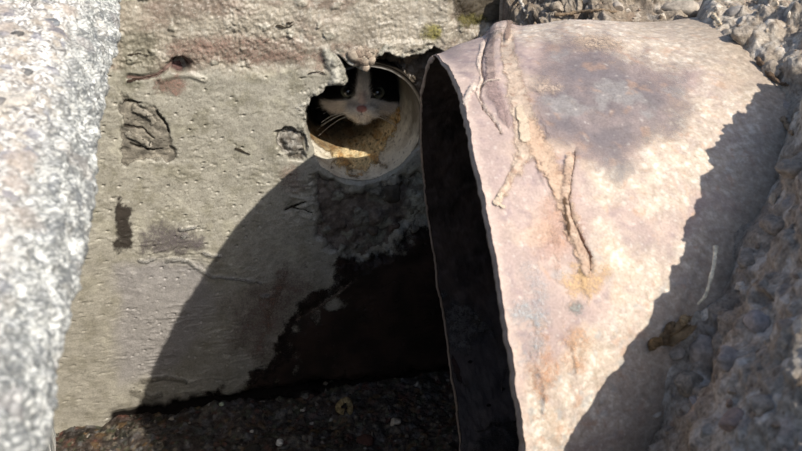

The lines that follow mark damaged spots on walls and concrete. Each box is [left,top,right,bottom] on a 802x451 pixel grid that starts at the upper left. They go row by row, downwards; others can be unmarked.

peeling [118,93,176,166]
spalling [276,45,425,159]
crack [462,29,512,134]
spalling [315,171,427,256]
damp [205,224,449,399]